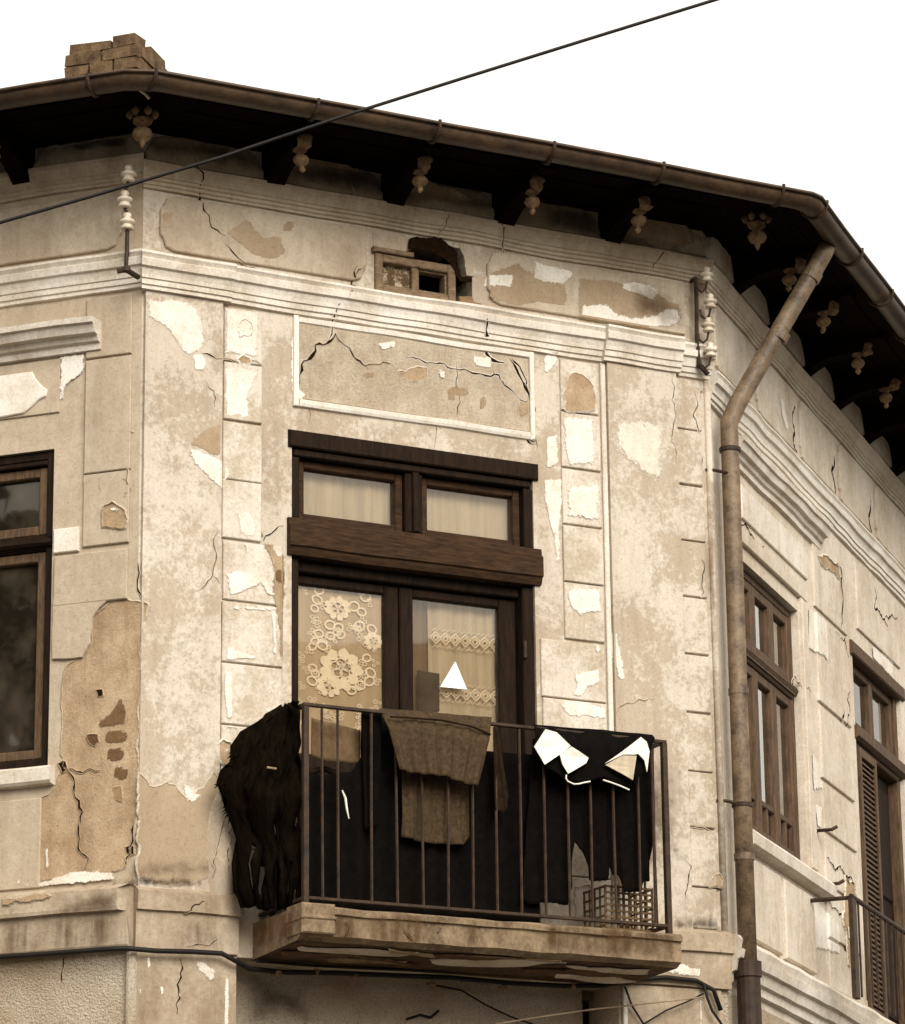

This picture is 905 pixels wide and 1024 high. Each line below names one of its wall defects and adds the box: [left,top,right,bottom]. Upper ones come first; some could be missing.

crack [188,153,271,271]
peeling [146,298,206,370]
peeling [190,307,259,488]
crack [299,264,538,450]
spalling [456,246,681,329]
peeling [546,371,597,467]
peeling [227,543,286,656]
crack [874,587,898,627]
spalling [2,598,256,907]
crack [62,765,100,869]
crack [827,856,853,881]
crack [175,939,218,1014]